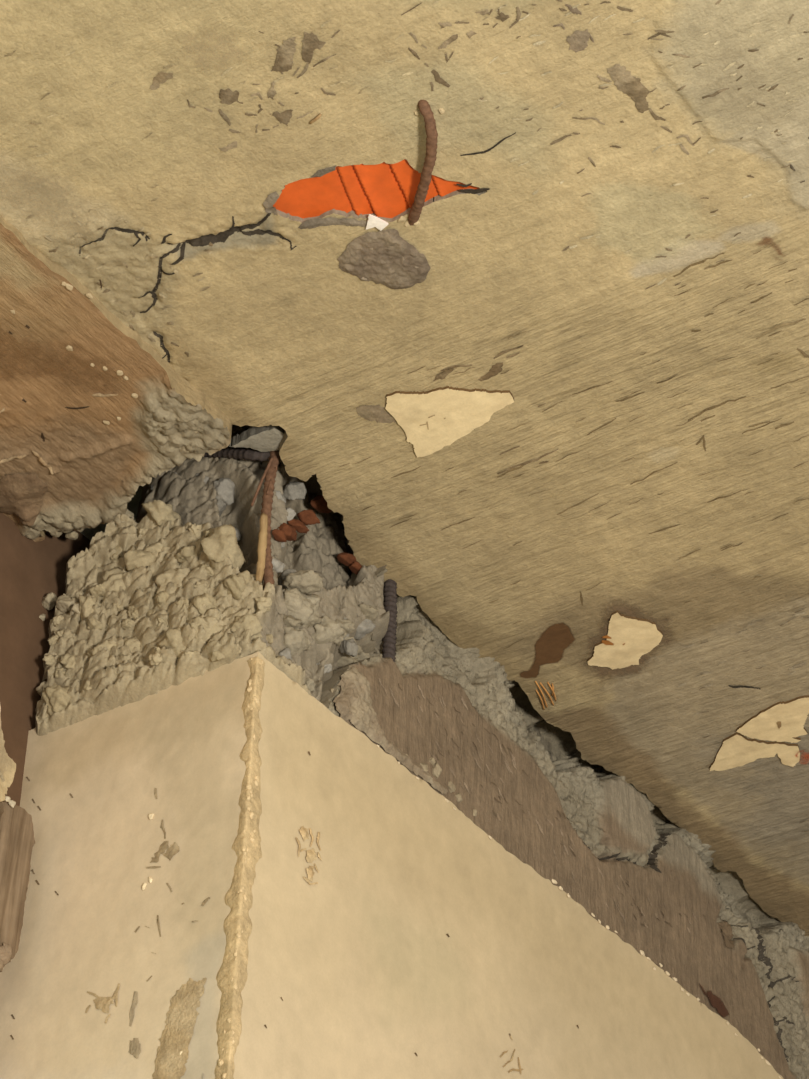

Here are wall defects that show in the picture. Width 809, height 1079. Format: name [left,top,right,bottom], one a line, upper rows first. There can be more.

spalling [298,4,530,289]
spalling [263,192,280,216]
crack [79,213,297,363]
spalling [657,238,742,285]
peeling [356,345,523,478]
spalling [688,396,746,422]
spalling [742,418,794,434]
peeling [587,611,663,670]
spalling [35,424,576,1079]
peeling [709,695,809,771]
crack [722,920,799,1062]